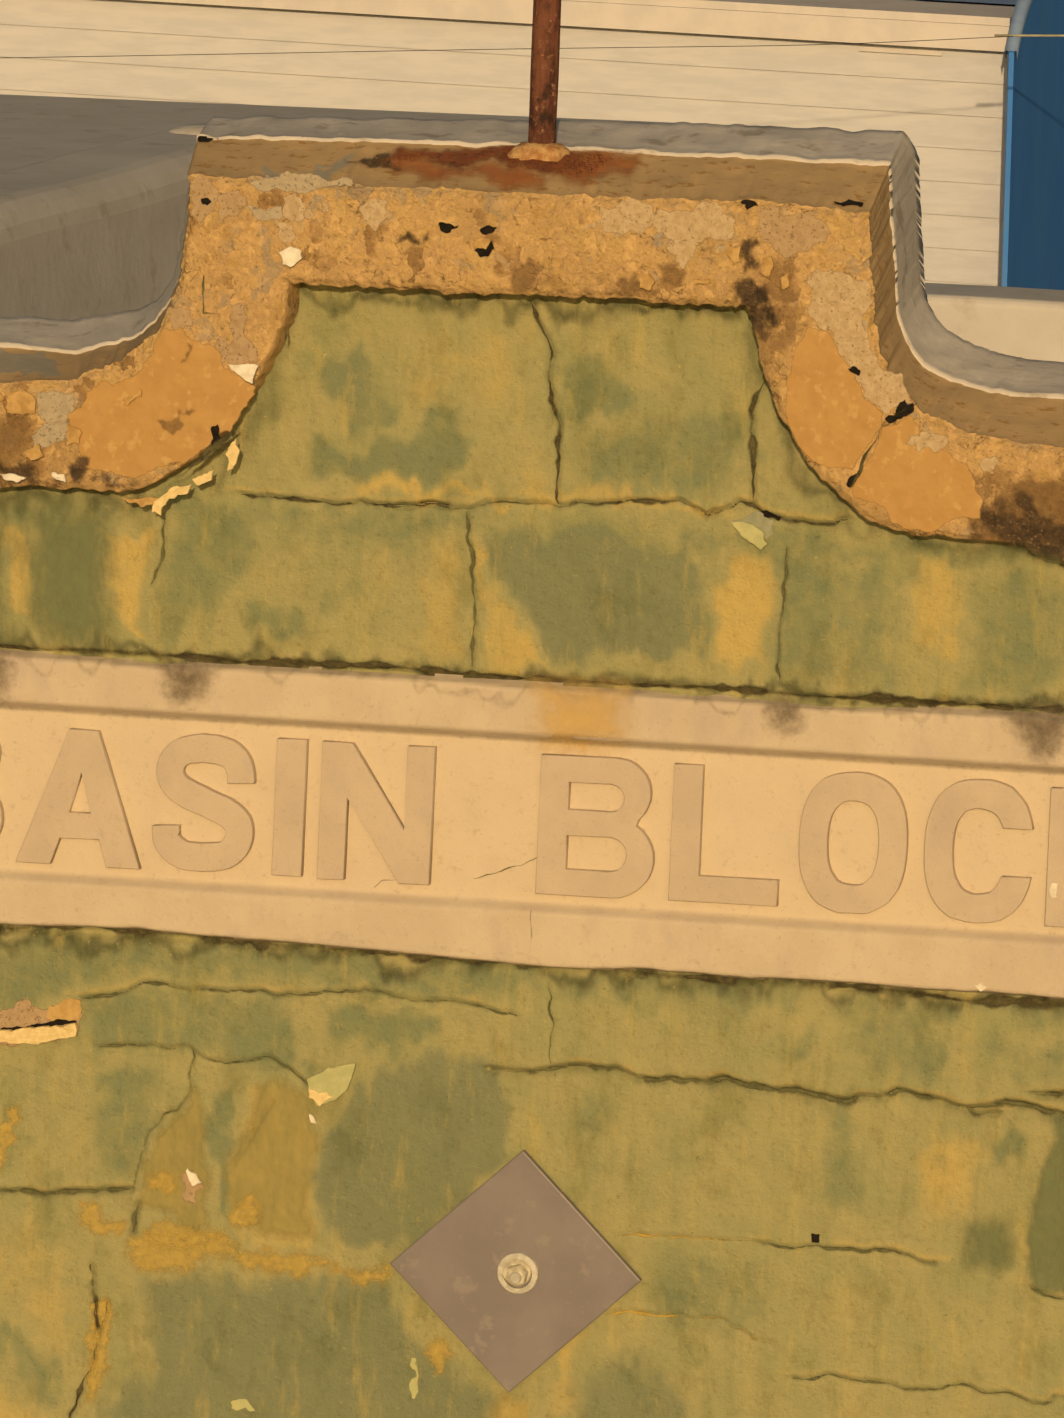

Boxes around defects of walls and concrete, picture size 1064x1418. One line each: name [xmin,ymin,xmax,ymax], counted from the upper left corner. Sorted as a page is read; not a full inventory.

corrosion [386,145,636,190]
spalling [190,171,353,267]
spalling [0,390,82,460]
peeling [0,473,27,482]
crack [122,302,673,666]
crack [706,380,916,609]
spalling [0,998,82,1047]
peeling [307,1063,356,1124]
crack [426,987,1064,1116]
crack [3,1187,139,1232]
damp [1028,1119,1064,1291]
crack [69,1264,108,1418]